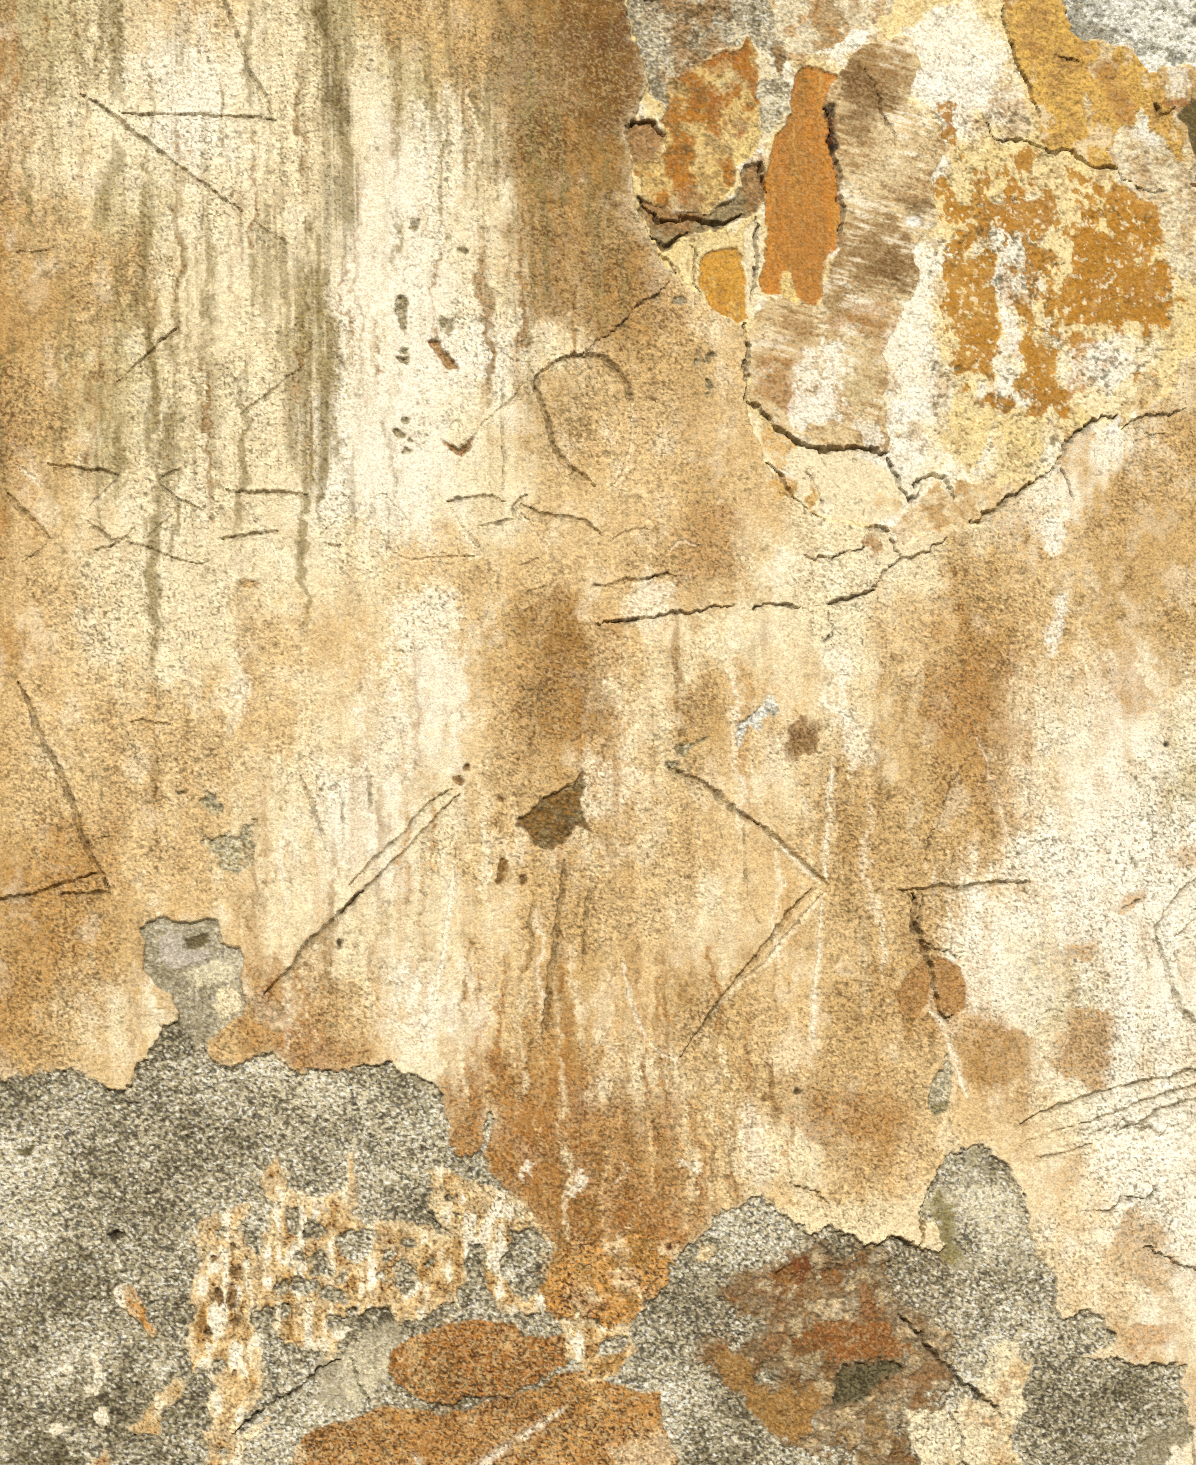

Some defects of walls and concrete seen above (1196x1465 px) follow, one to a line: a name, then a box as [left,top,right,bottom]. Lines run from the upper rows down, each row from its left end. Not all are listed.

water stain [108,0,127,100]
water stain [92,141,127,237]
water stain [131,190,190,360]
water stain [273,0,360,495]
crack [624,120,667,138]
spalling [625,0,1196,546]
water stain [202,335,224,471]
crack [581,161,1188,564]
crack [596,590,877,645]
spalling [516,772,592,850]
spalling [0,917,1195,1465]
crack [1142,1245,1196,1276]